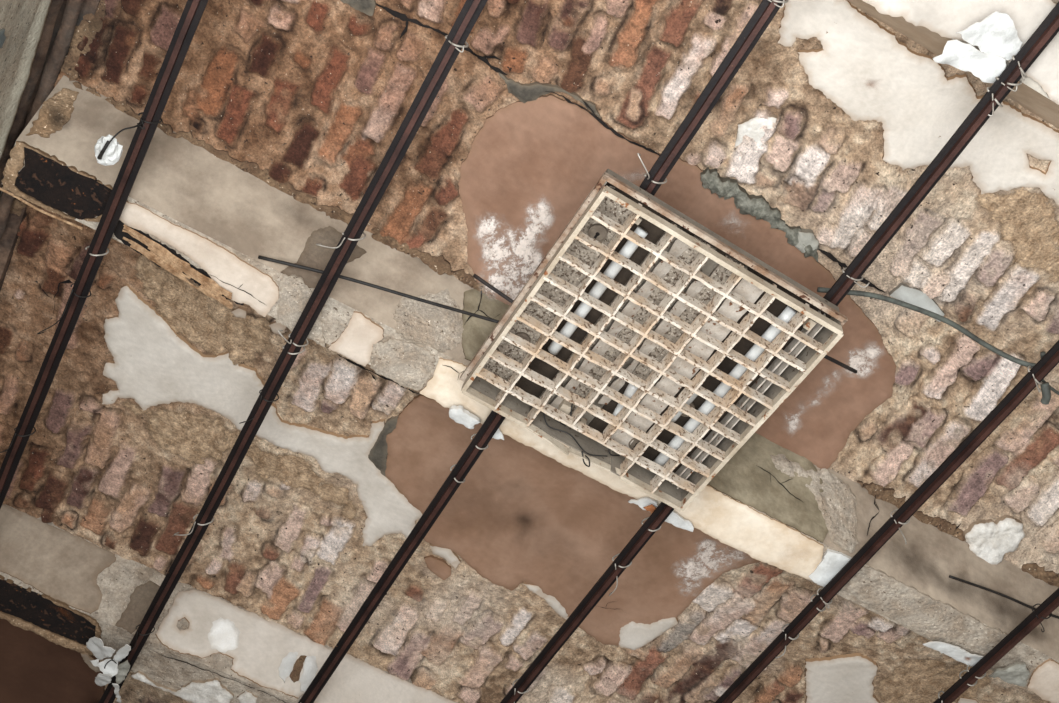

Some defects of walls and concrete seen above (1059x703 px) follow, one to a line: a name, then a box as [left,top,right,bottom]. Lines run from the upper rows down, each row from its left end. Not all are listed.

peeling [102,118,354,464]
spalling [307,289,492,425]
crack [376,3,507,75]
leakage [478,202,553,300]
crack [545,91,660,156]
spalling [515,182,832,473]
peeling [778,0,1059,170]
peeling [950,101,1059,282]
peeling [246,403,423,546]
leakage [677,540,743,592]
peeling [673,454,906,587]
spalling [804,563,1059,703]